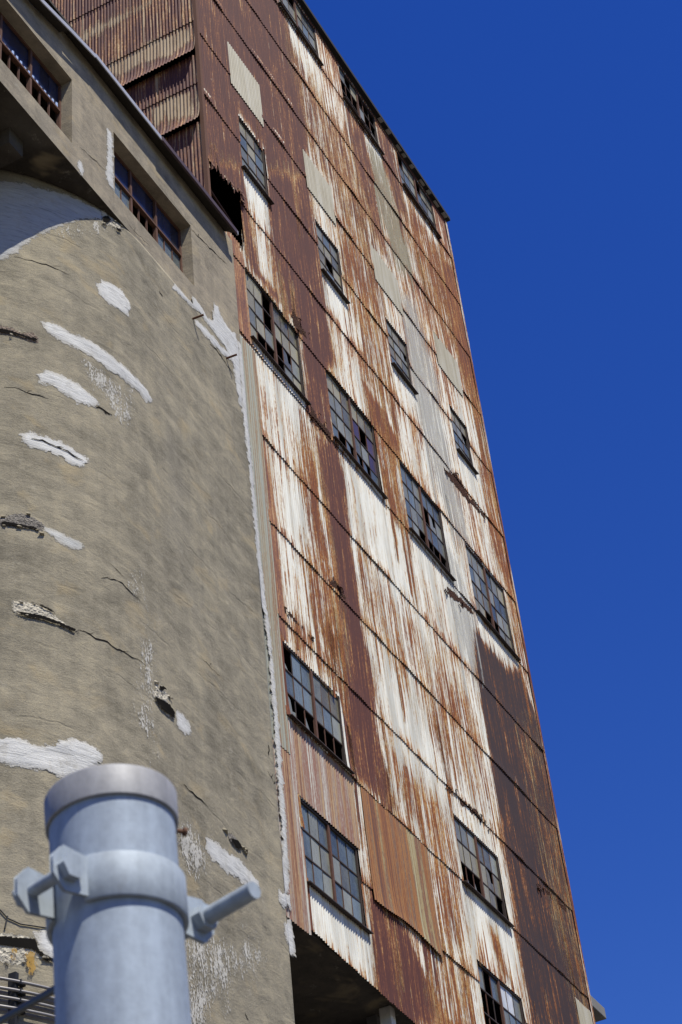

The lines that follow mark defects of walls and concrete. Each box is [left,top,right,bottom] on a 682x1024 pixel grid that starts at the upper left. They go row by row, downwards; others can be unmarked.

spalling [0,512,45,536]
rust [197,0,591,1024]
spalling [12,600,76,632]
crack [77,630,144,664]
spalling [153,680,175,719]
spalling [222,827,248,855]